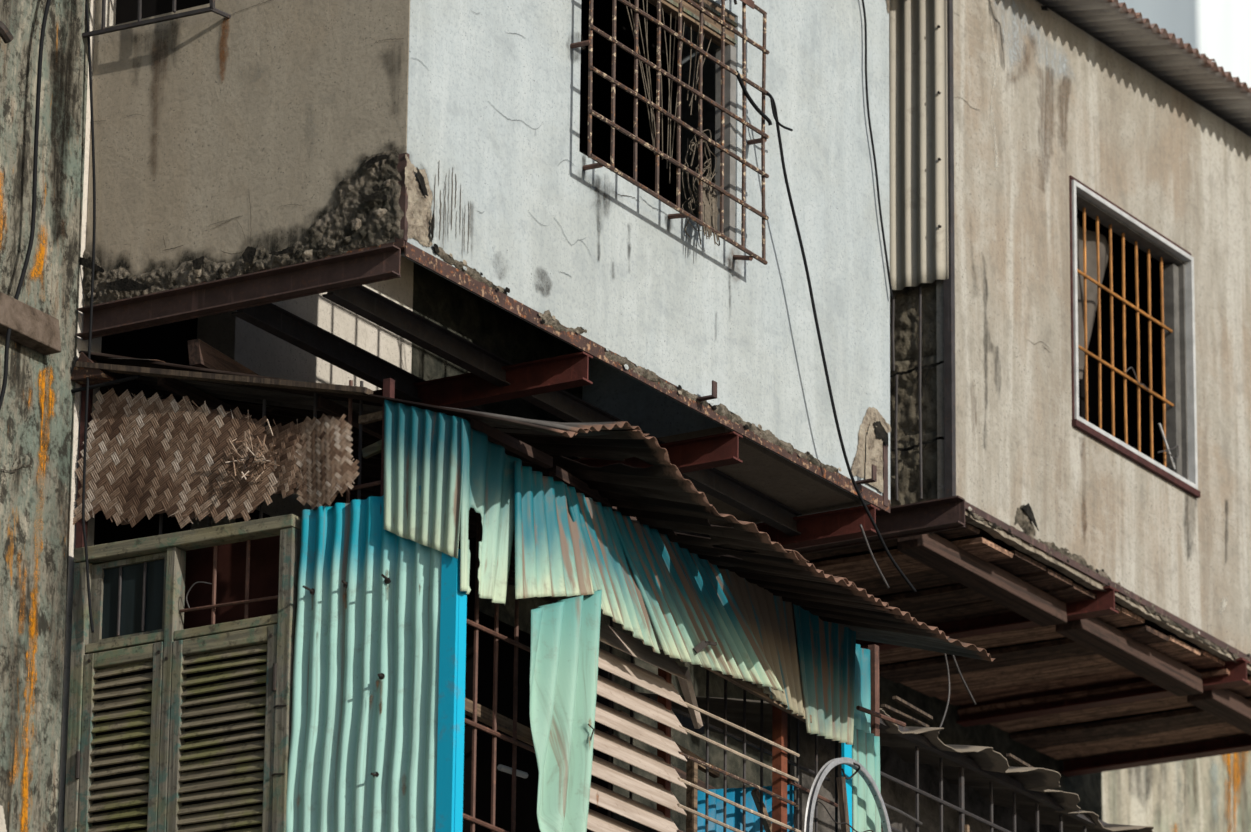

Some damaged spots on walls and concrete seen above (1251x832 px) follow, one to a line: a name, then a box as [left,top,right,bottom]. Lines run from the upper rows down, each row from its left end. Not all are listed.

corrosion [220,18,229,80]
spalling [79,150,510,306]